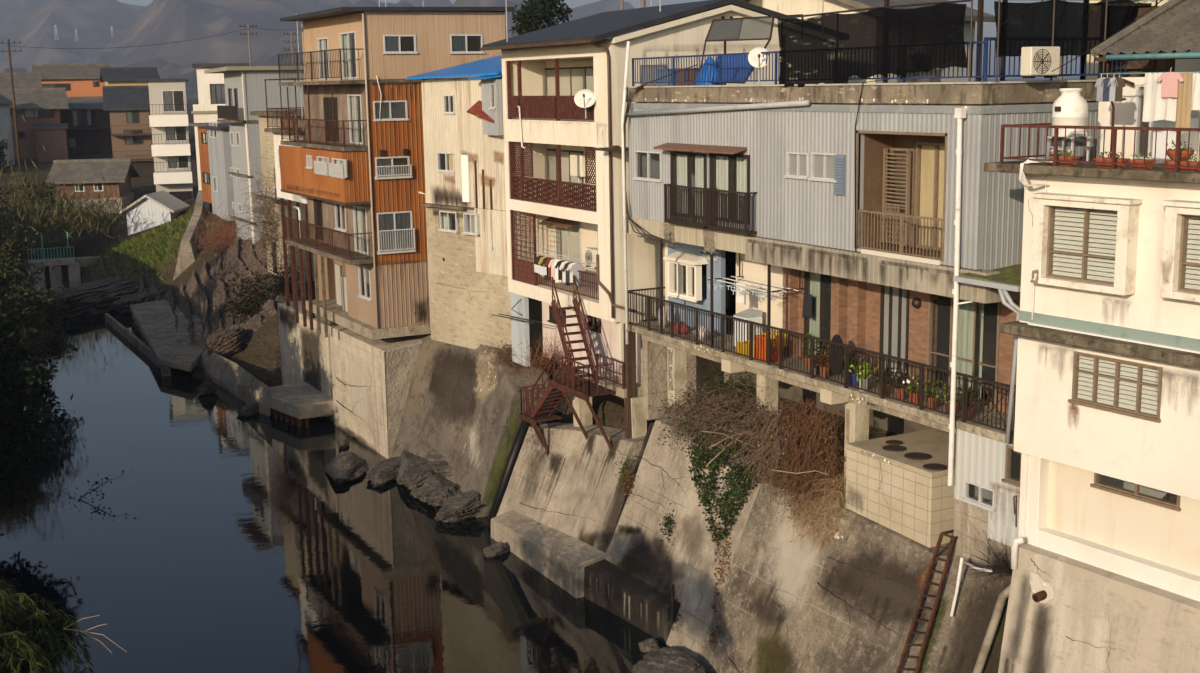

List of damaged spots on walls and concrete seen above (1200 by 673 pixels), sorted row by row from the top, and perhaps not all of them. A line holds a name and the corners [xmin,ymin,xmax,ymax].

damp [429,350,478,419]
damp [824,553,924,637]